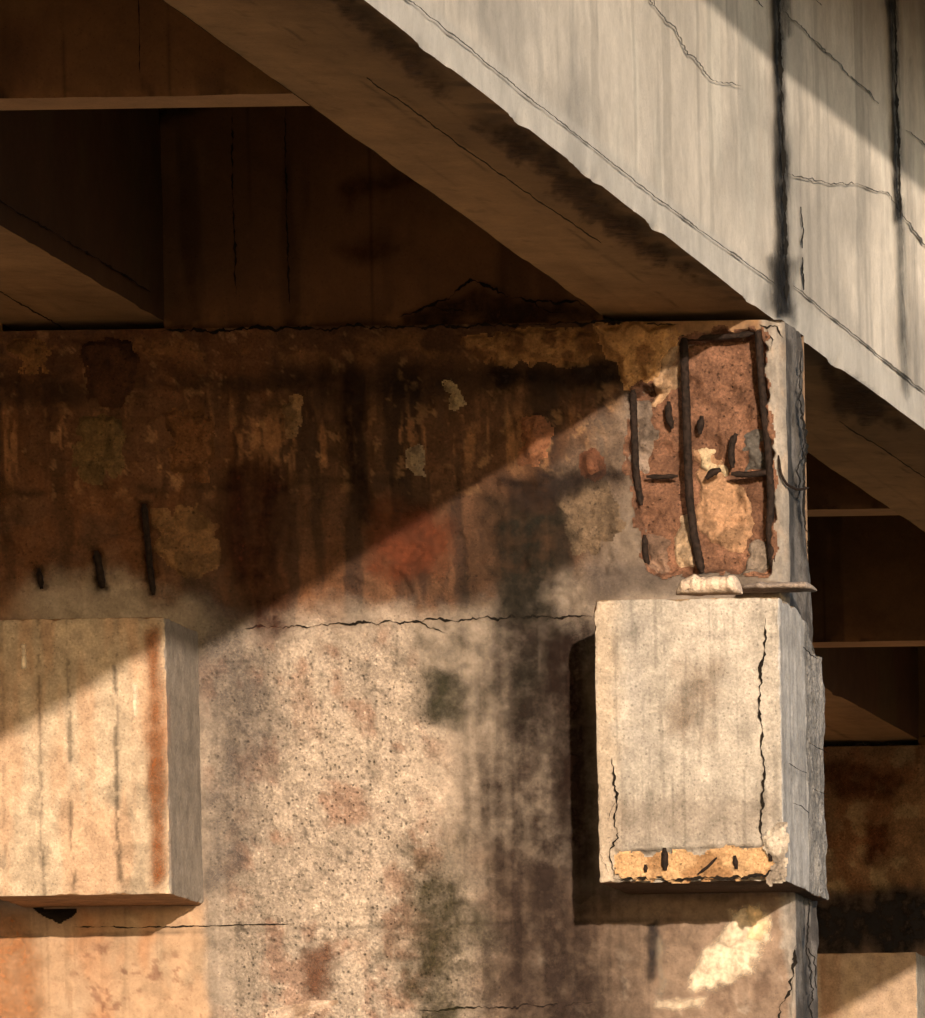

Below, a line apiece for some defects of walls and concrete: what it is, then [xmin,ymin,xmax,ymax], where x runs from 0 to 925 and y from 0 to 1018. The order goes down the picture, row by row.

crack [367,78,601,243]
crack [408,0,925,392]
leakage [770,0,792,316]
leakage [888,0,908,386]
spalling [460,321,809,579]
crack [759,324,810,554]
crack [246,615,585,632]
leakage [479,470,626,1018]
crack [599,763,771,882]
spalling [614,822,789,886]
crack [758,618,767,845]
crack [778,900,817,1018]